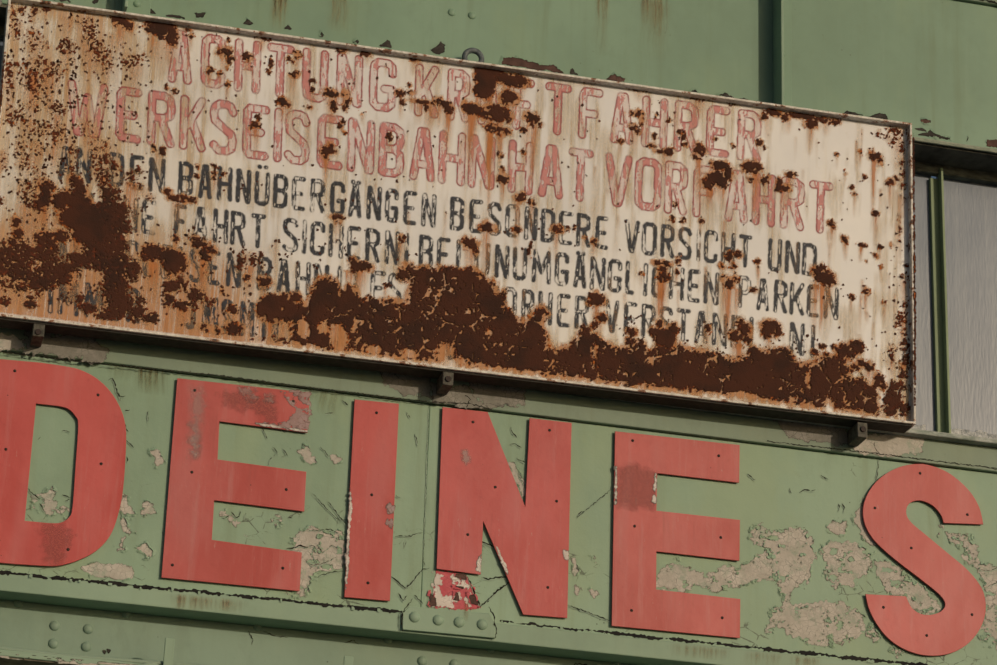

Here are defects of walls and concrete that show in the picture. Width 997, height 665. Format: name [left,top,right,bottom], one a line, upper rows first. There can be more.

rust [0,2,911,421]
peeling [0,331,110,365]
crack [0,351,492,630]
peeling [286,491,353,599]
peeling [427,554,482,611]
peeling [656,496,941,659]
peeling [937,524,997,650]